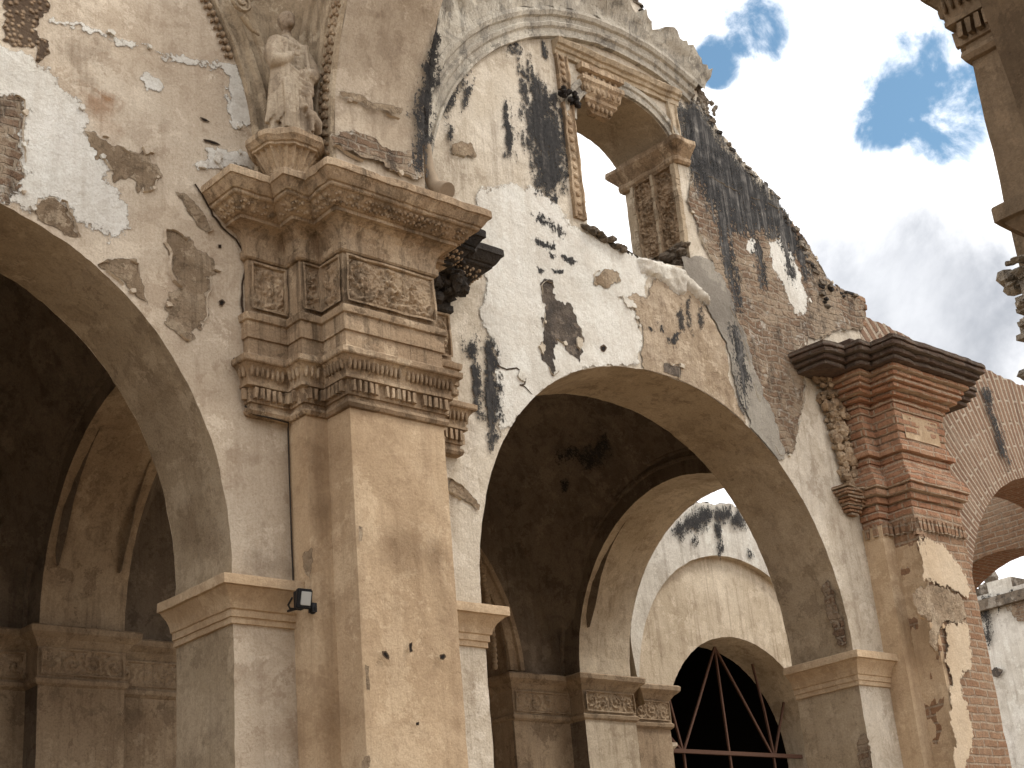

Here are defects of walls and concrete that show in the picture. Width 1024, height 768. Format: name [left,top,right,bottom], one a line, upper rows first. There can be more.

flaking render [0,94,81,237]
spalling [85,131,163,193]
leakage [406,29,476,178]
leakage [501,40,578,274]
spalling [98,258,148,304]
spalling [163,228,225,342]
crack [194,184,245,313]
leakage [461,331,506,454]
spalling [538,279,584,376]
leakage [677,97,814,416]
flaking render [687,171,866,485]
leakage [671,505,747,560]